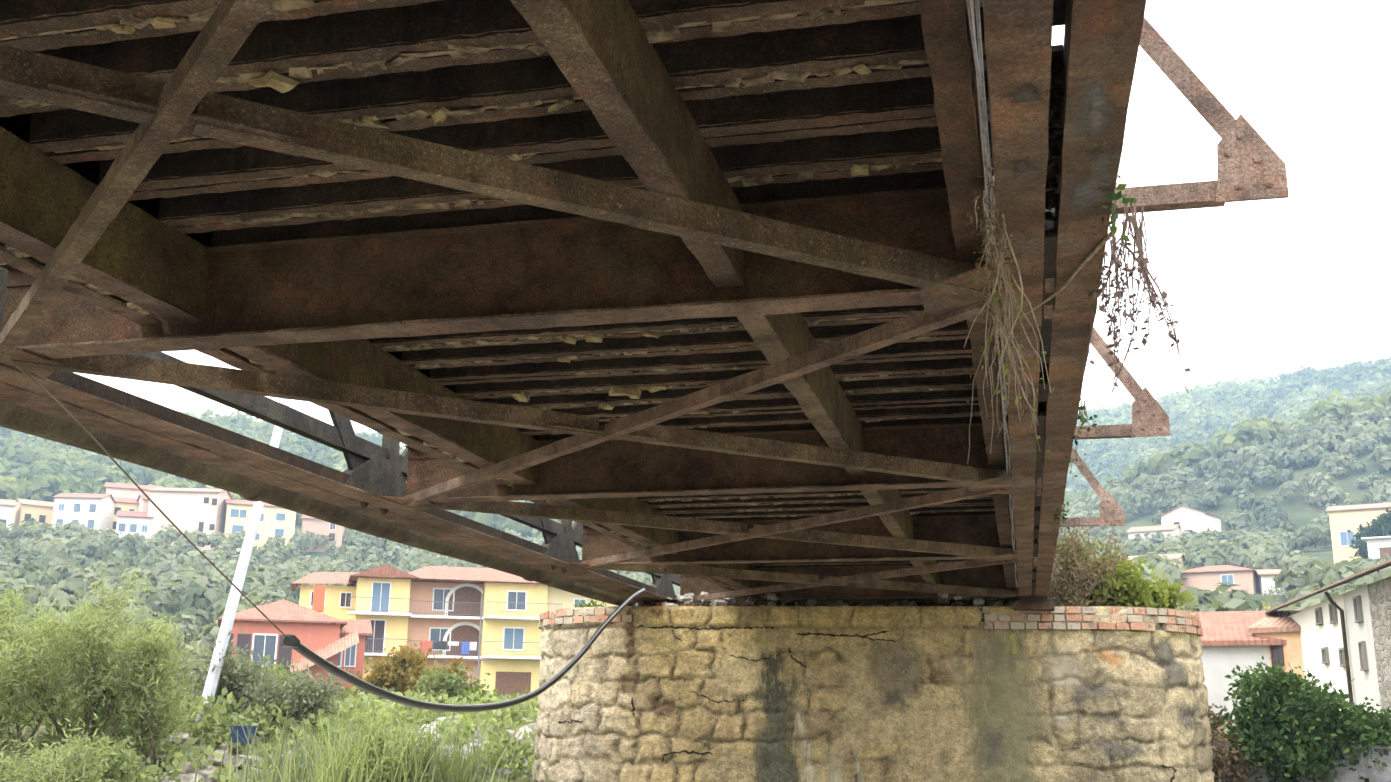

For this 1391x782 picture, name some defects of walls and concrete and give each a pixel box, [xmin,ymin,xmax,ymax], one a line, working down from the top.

crack [637,625,896,668]
crack [691,691,744,703]